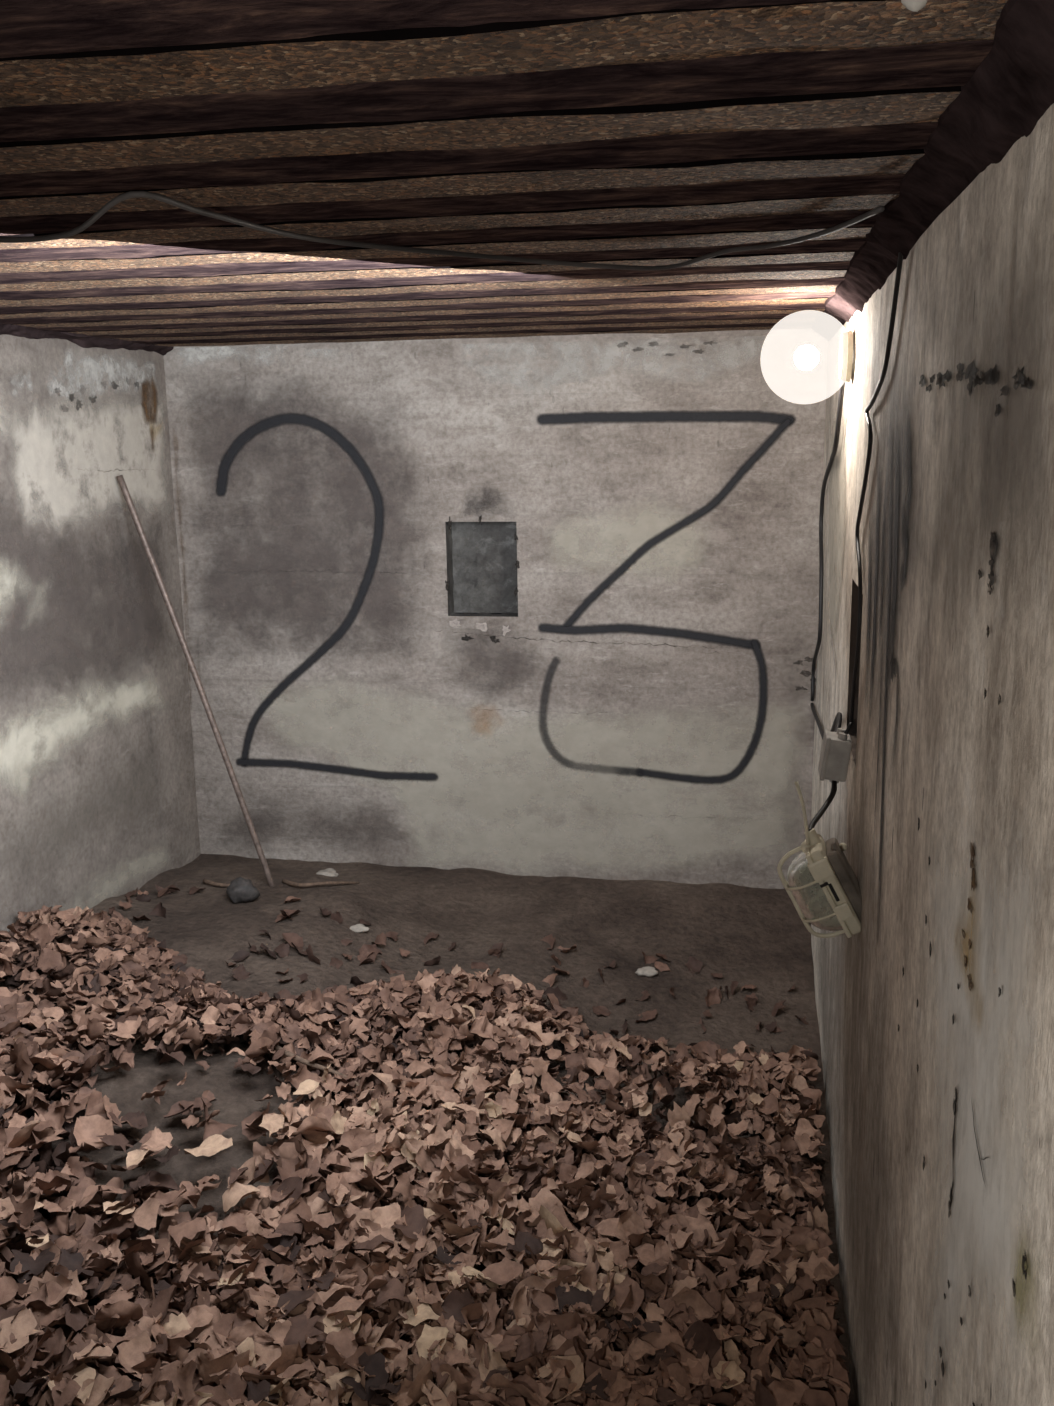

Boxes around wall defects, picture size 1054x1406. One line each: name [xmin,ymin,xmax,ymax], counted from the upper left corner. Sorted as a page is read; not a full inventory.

damp [0,500,162,790]
damp [866,384,911,906]
rust [962,842,976,991]
crack [948,1087,989,1218]